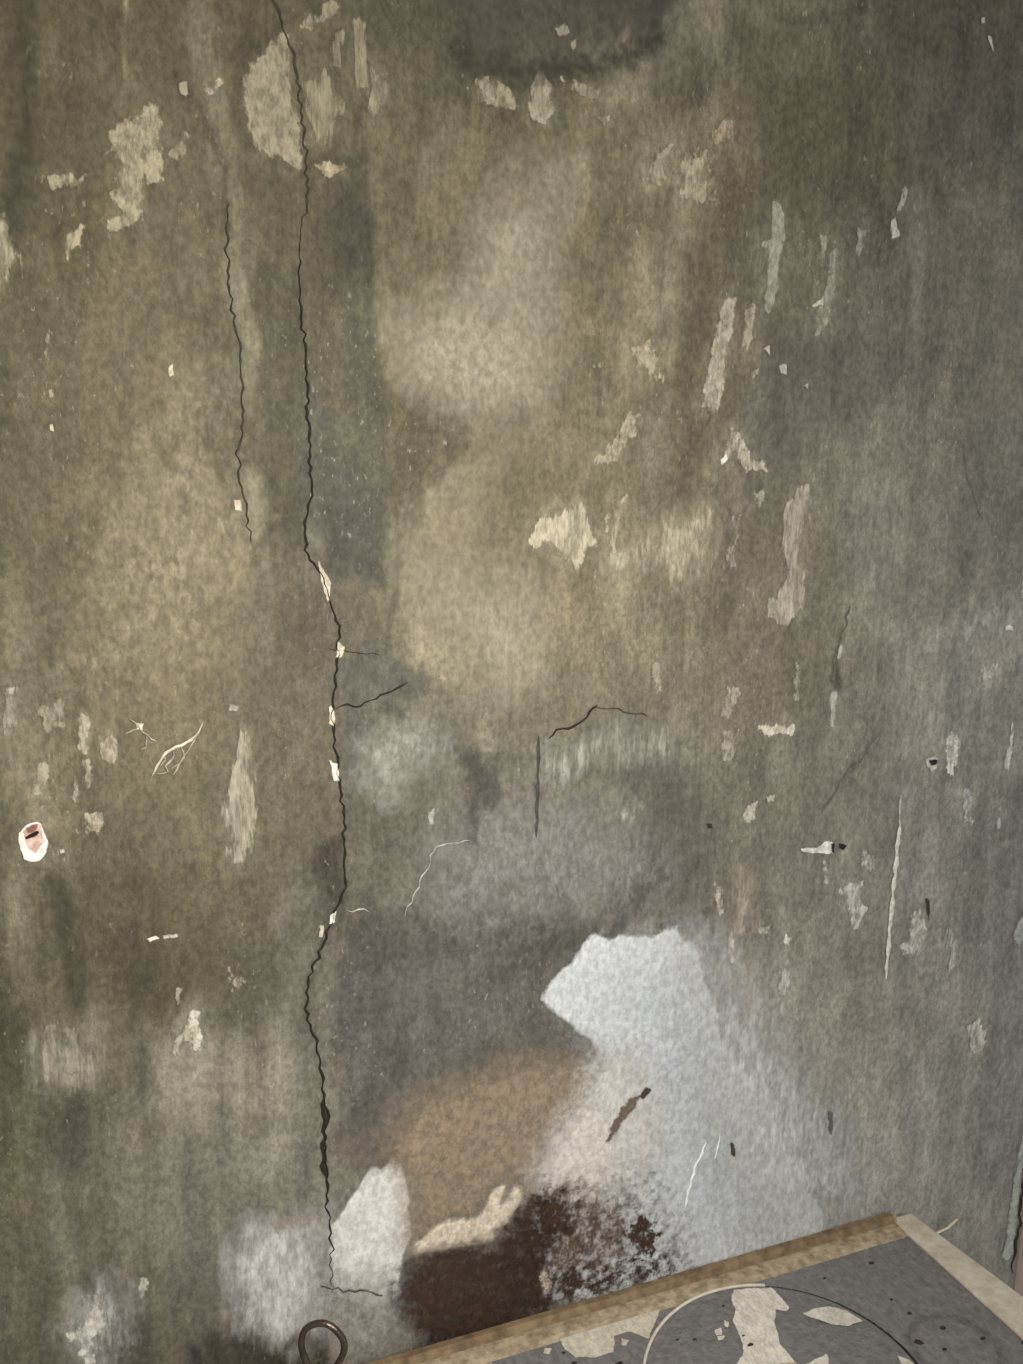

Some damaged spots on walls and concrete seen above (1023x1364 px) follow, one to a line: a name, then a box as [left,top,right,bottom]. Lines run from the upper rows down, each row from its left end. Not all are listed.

peeling [315,160,345,178]
crack [224,204,252,540]
crack [272,0,408,1296]
leakage [33,760,49,796]
leakage [35,696,66,733]
crack [549,705,647,739]
leakage [945,732,960,777]
leakage [713,865,753,964]
leakage [42,1007,97,1076]
peeling [534,926,858,1302]
peeling [226,1158,412,1357]
leakage [66,1291,106,1364]